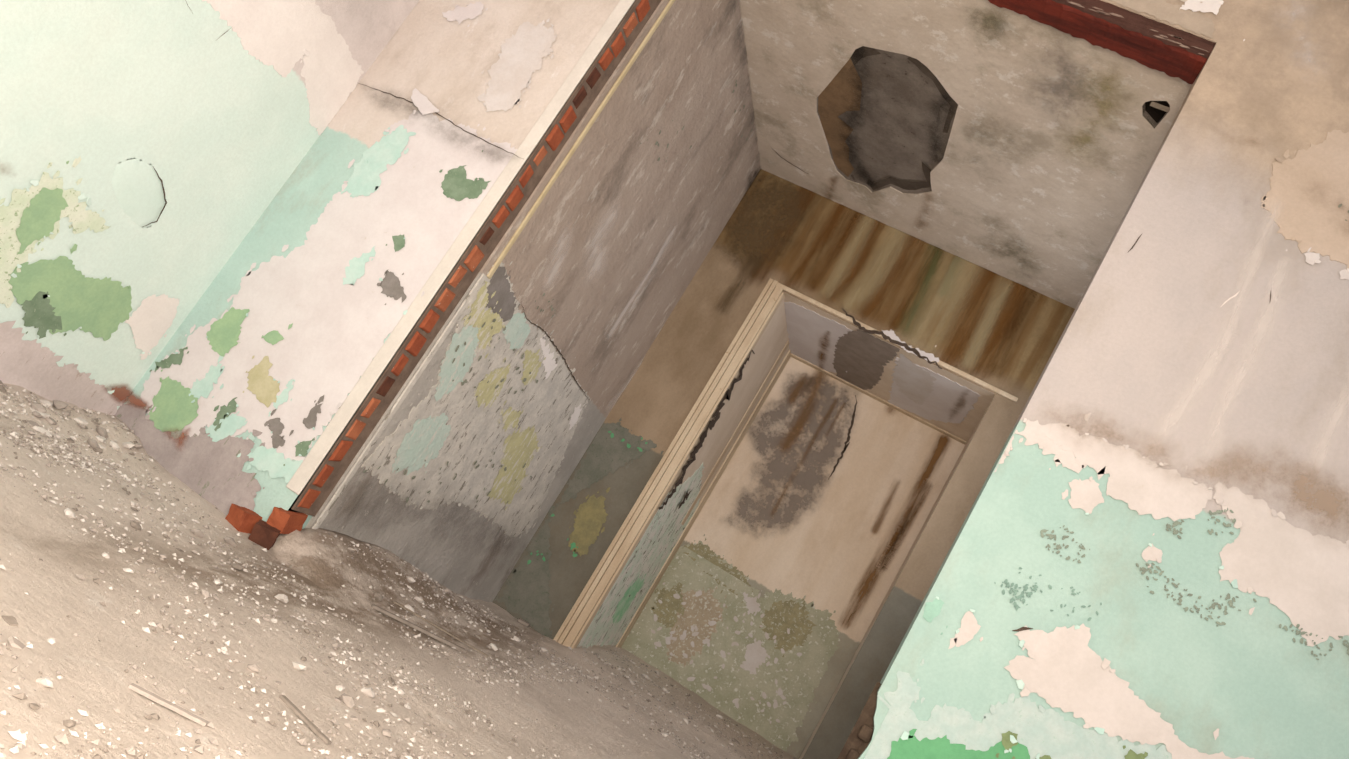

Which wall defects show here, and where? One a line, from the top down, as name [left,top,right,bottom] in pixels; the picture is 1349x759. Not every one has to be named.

flaking render [817,46,958,194]
peeling [0,0,662,557]
crack [842,308,942,369]
peeling [1261,130,1349,280]
crack [659,350,755,510]
water stain [738,377,850,528]
peeling [577,463,840,753]
peeling [837,567,1254,759]
peeling [994,413,1349,660]